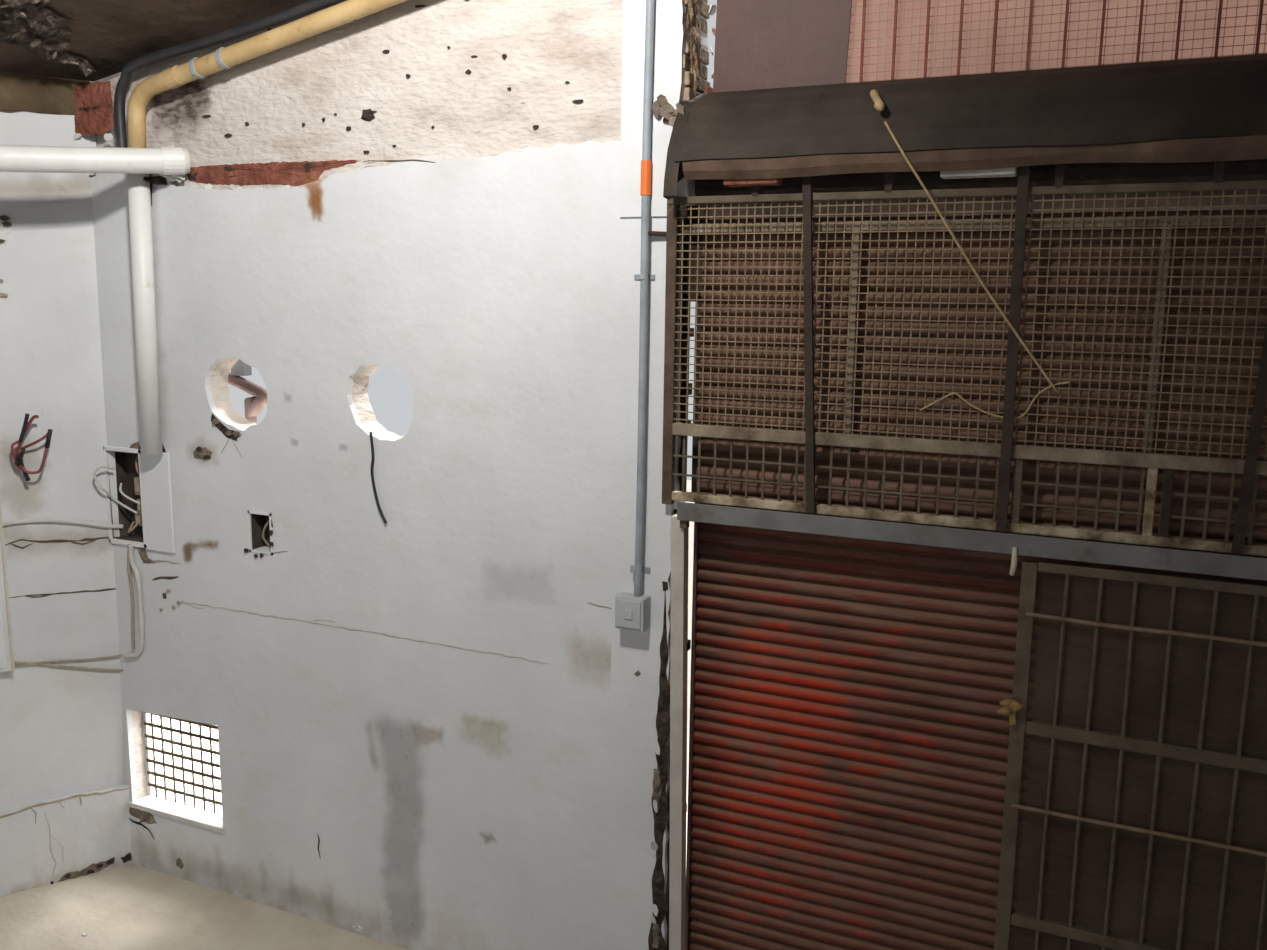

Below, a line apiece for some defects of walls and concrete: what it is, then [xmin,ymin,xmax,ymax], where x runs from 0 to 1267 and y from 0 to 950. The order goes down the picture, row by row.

spalling [0,0,329,147]
flaking render [143,0,623,206]
flaking render [210,357,257,441]
flaking render [352,364,404,440]
flaking render [129,710,157,824]
spalling [648,581,670,950]